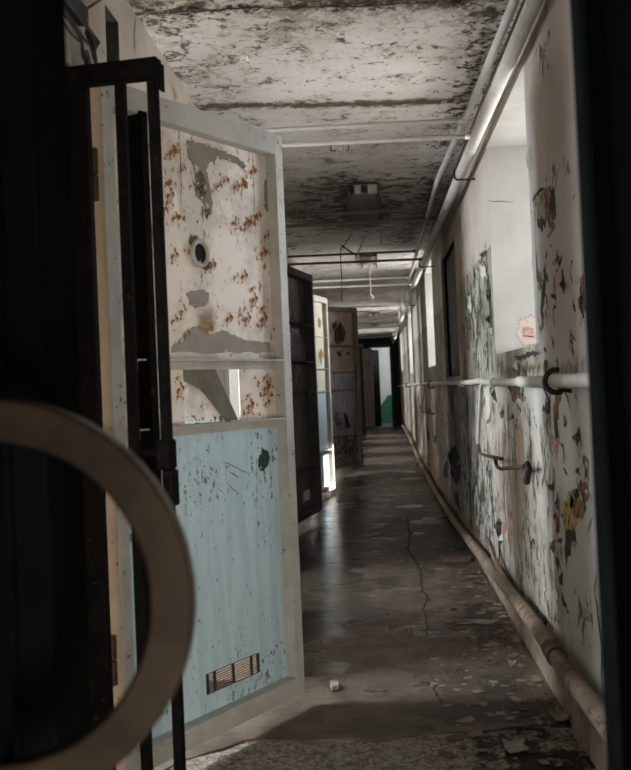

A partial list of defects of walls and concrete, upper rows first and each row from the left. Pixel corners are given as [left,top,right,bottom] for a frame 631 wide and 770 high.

water stain [135,0,518,249]
rust [163,176,185,225]
peeling [186,140,246,217]
rust [216,165,258,194]
rust [230,211,262,235]
rust [201,312,233,334]
peeling [171,325,274,354]
rust [243,286,268,331]
peeling [530,186,585,356]
peeling [483,359,527,454]
peeling [542,427,589,617]
crack [372,512,431,632]